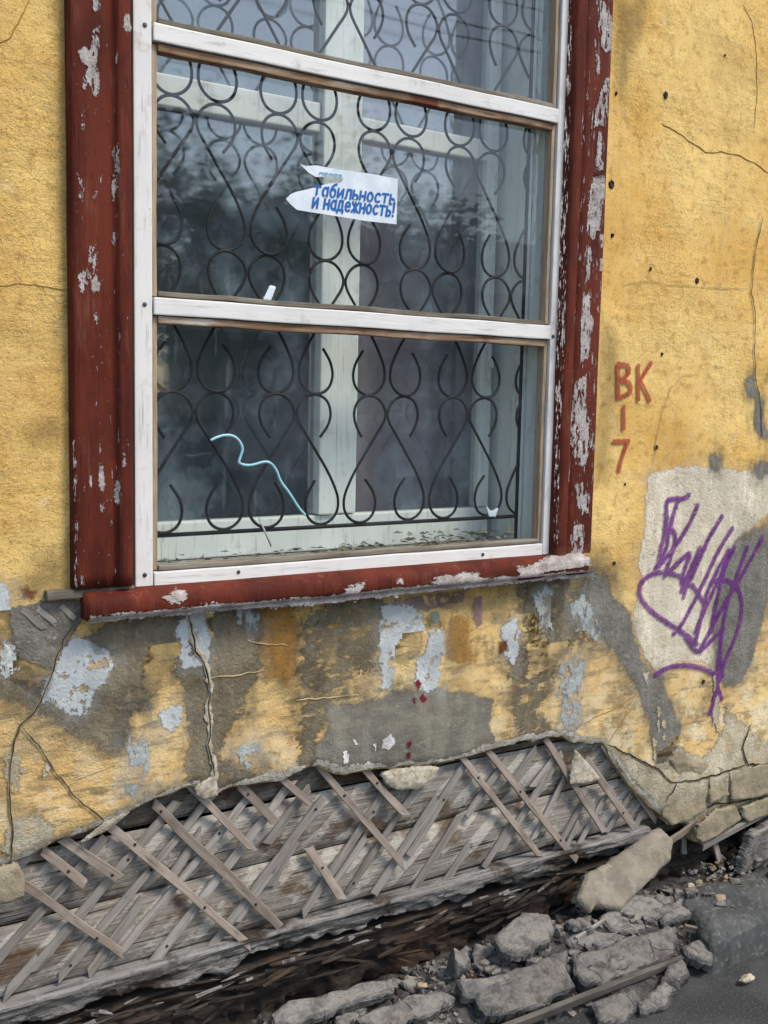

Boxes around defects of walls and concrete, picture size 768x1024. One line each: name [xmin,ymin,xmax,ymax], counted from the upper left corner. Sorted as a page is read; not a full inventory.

crack [663,124,768,173]
peeling [0,0,613,904]
crack [8,621,104,863]
crack [187,614,263,780]
crack [575,691,768,808]